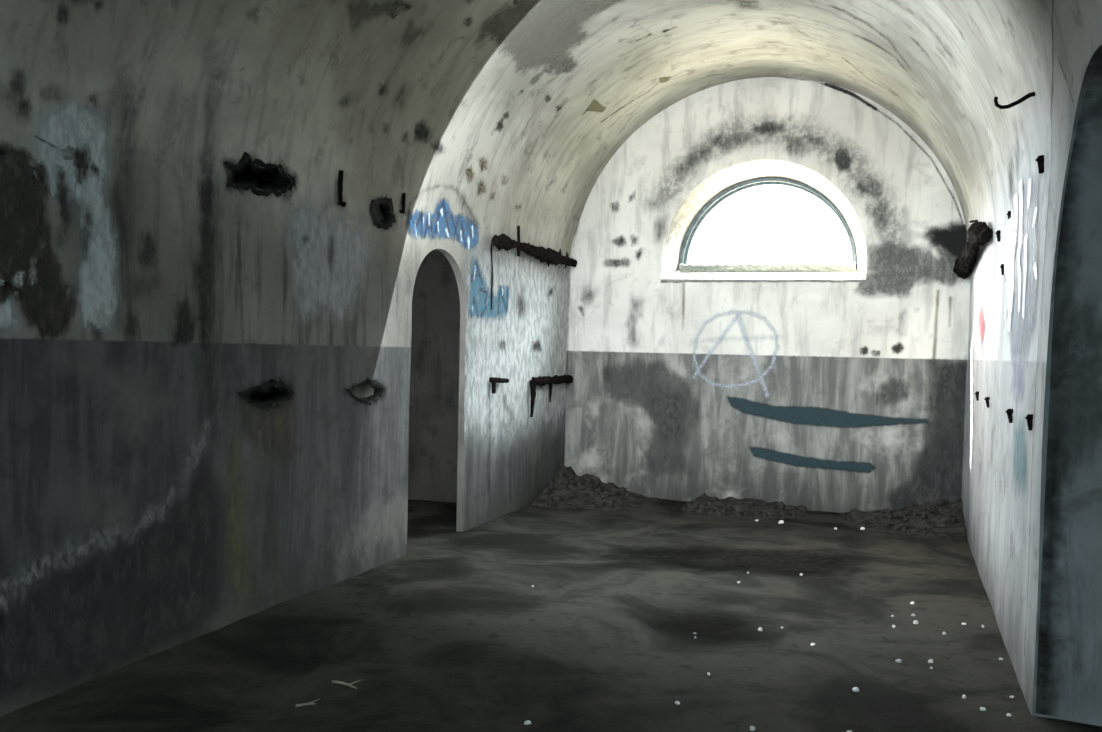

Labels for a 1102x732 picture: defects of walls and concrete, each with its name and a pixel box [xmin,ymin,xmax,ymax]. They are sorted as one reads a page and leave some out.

peeling [480,0,620,93]
damp [755,123,782,134]
spalling [223,151,297,198]
damp [835,149,850,170]
damp [59,187,69,225]
damp [611,236,641,266]